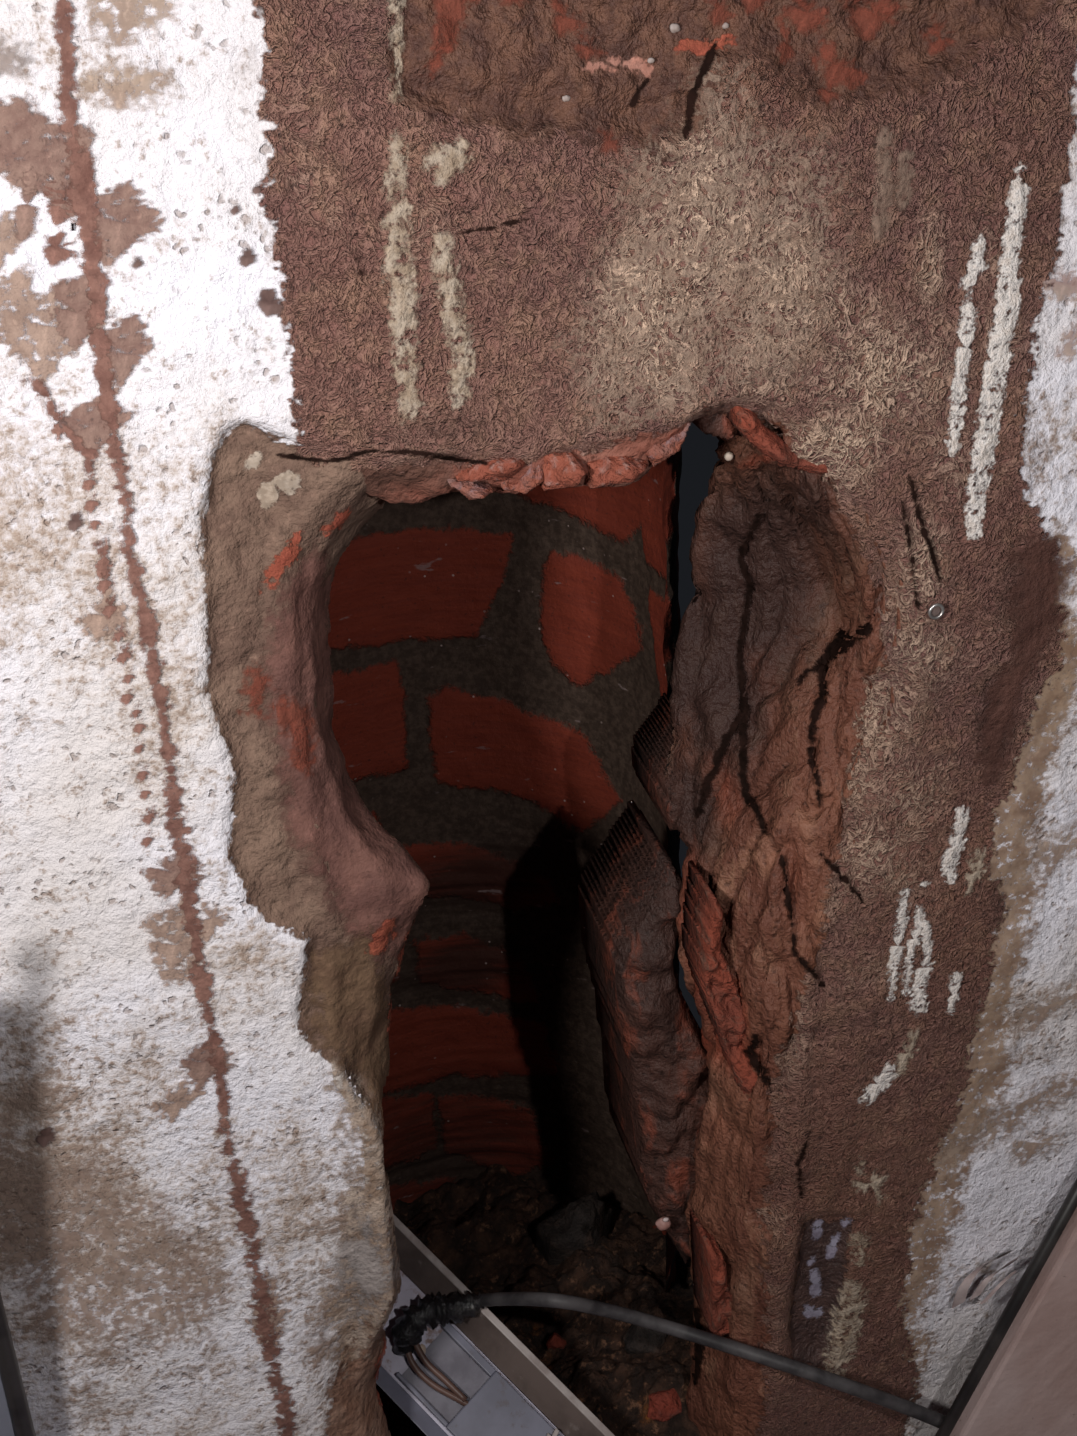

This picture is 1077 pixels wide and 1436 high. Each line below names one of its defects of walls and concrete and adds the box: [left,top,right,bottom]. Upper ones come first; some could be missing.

crack [629,78,649,107]
crack [682,43,717,140]
crack [276,449,487,465]
crack [901,474,941,611]
corrosion [0,0,298,1436]
crack [693,514,825,987]
crack [796,622,872,808]
spalling [200,400,903,1436]
crack [820,853,863,903]
damp [886,519,1077,1401]
damp [858,1031,919,1106]
damp [0,1120,229,1355]